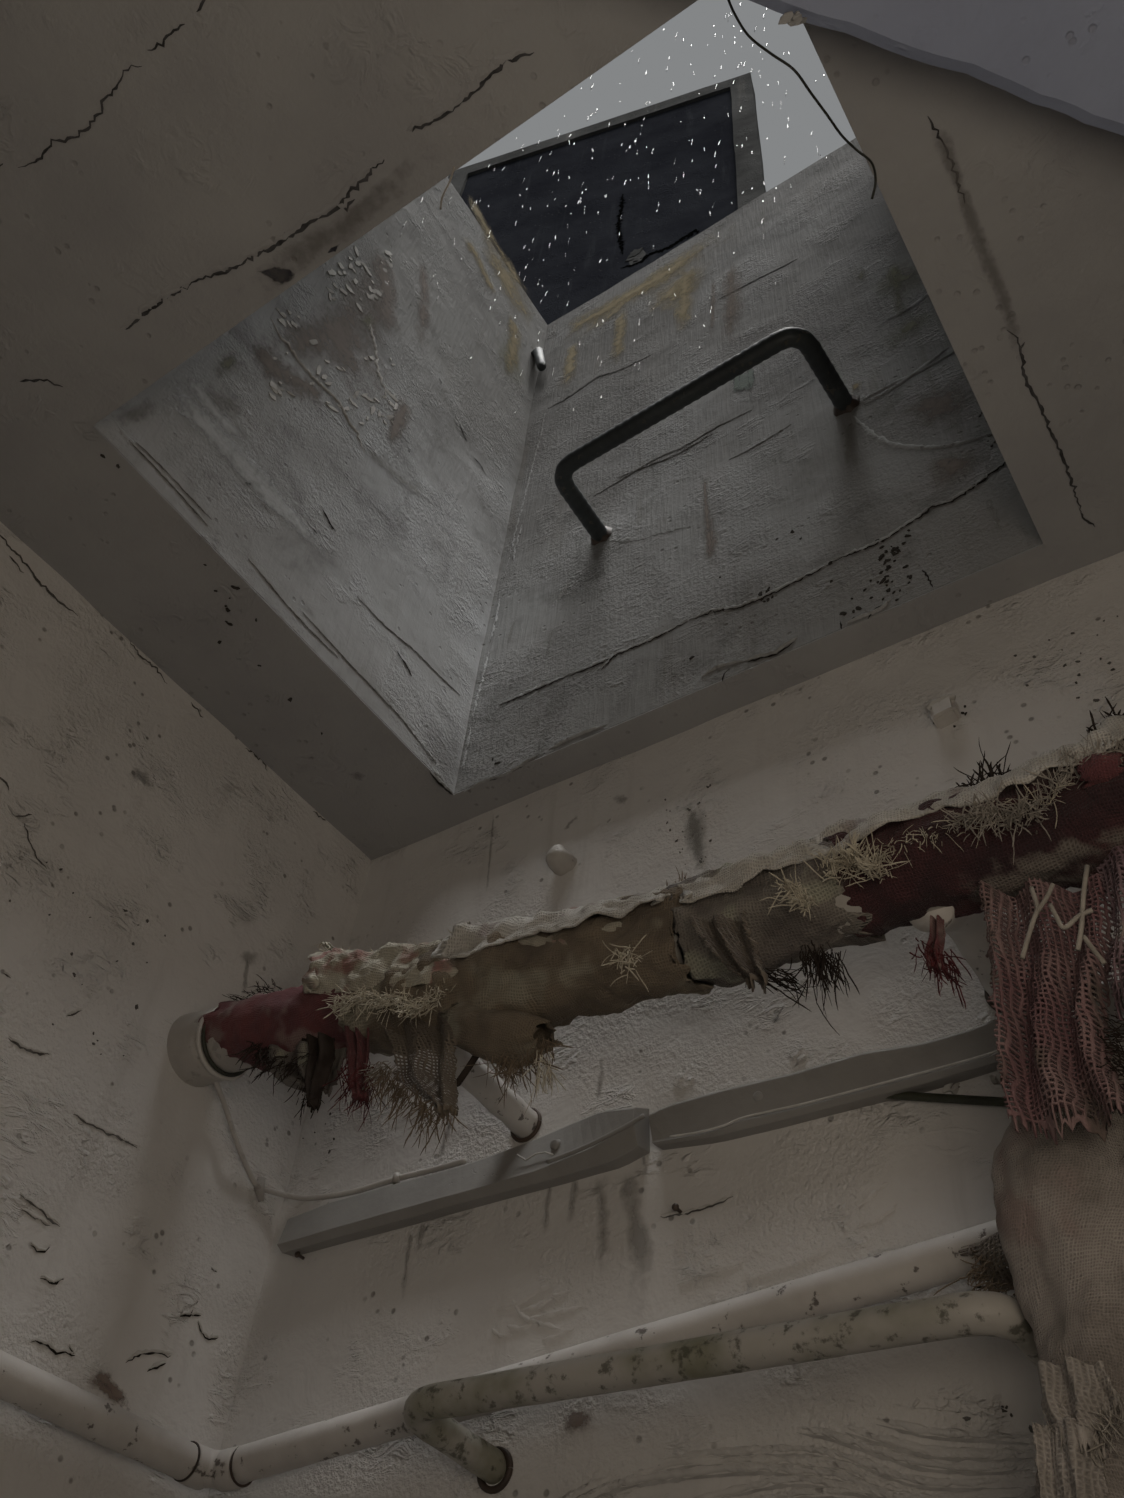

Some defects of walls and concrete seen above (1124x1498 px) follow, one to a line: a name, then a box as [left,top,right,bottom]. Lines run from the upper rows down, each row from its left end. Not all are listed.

crack [0,0,205,168]
crack [407,47,534,132]
crack [927,116,965,203]
crack [120,158,384,330]
leakage [261,267,294,284]
crack [129,440,211,526]
crack [1007,330,1095,527]
crack [249,407,1005,795]